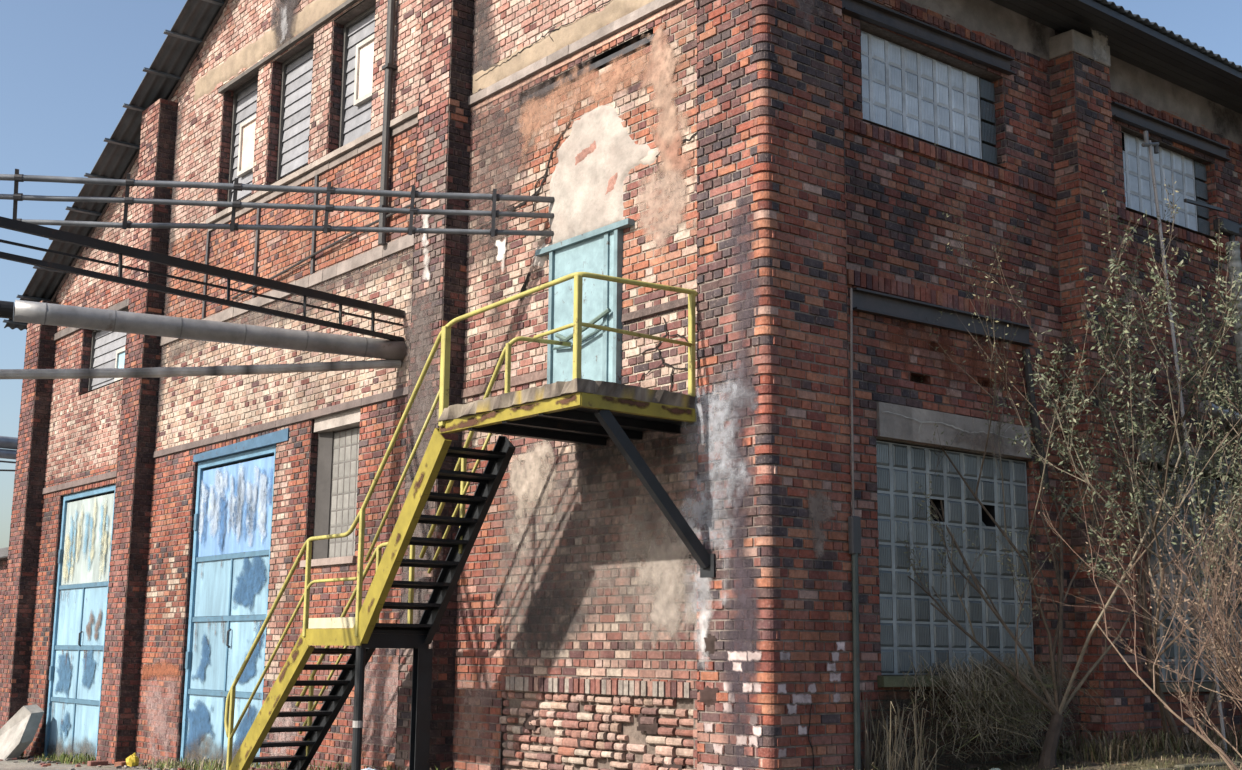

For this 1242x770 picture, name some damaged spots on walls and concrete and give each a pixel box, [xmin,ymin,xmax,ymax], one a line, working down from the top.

water stain [271,0,297,49]
crack [468,101,578,236]
flaking render [519,25,696,247]